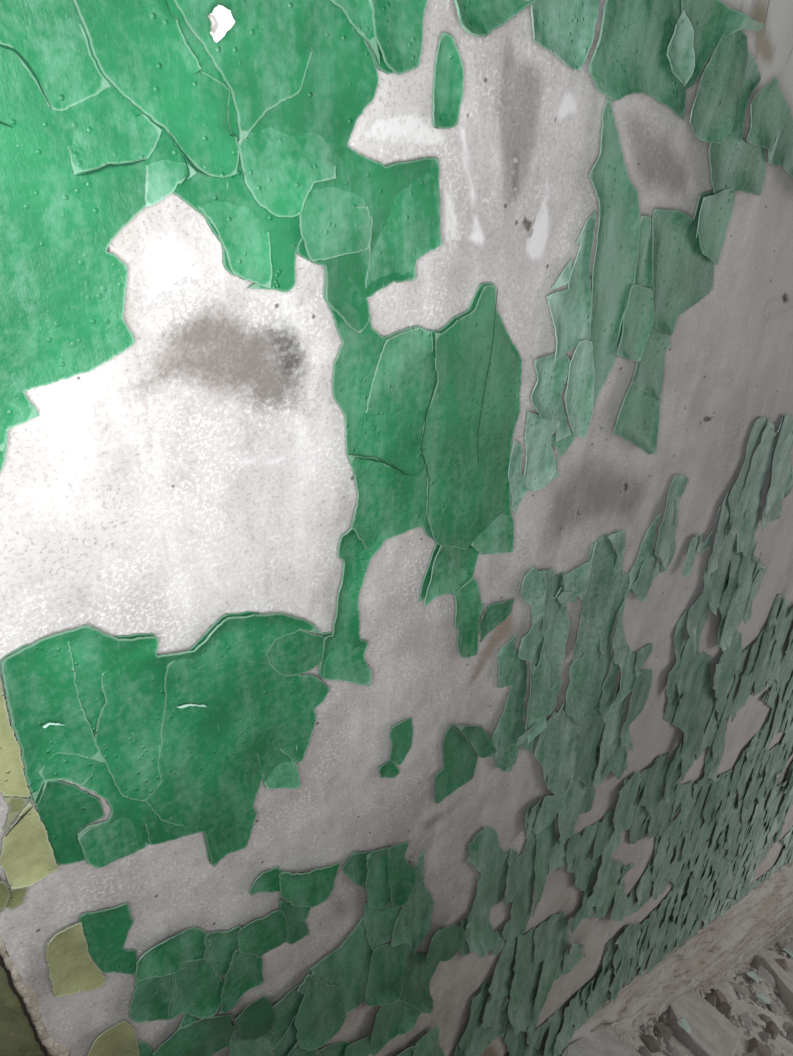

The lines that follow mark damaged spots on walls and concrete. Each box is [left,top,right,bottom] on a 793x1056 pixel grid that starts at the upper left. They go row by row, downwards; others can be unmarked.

peeling [454,0,600,70]
peeling [508,0,793,515]
damp [161,317,304,402]
peeling [0,0,522,915]
peeling [45,415,793,1056]
crack [5,806,33,837]
crack [0,955,49,1056]
spalling [0,936,71,1056]